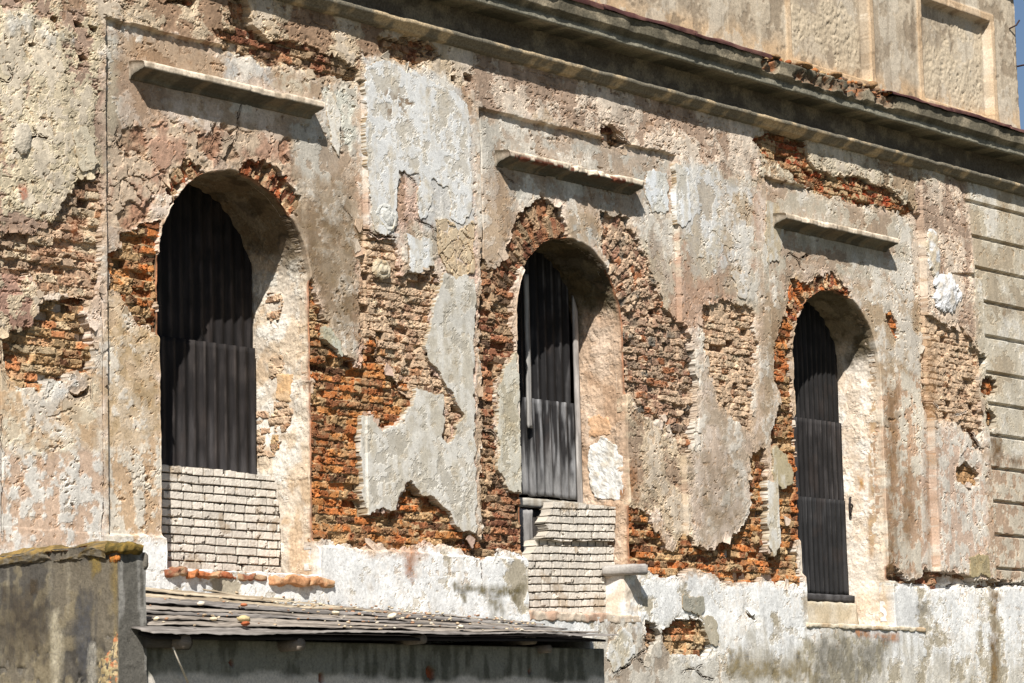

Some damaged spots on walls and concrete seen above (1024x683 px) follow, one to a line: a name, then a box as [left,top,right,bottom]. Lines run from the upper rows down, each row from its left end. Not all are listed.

spalling [0,126,160,393]
spalling [162,153,200,205]
peeling [212,2,566,564]
spalling [600,212,757,455]
spalling [588,272,851,590]
spalling [752,133,911,216]
spalling [918,311,993,450]
spalling [606,594,719,672]